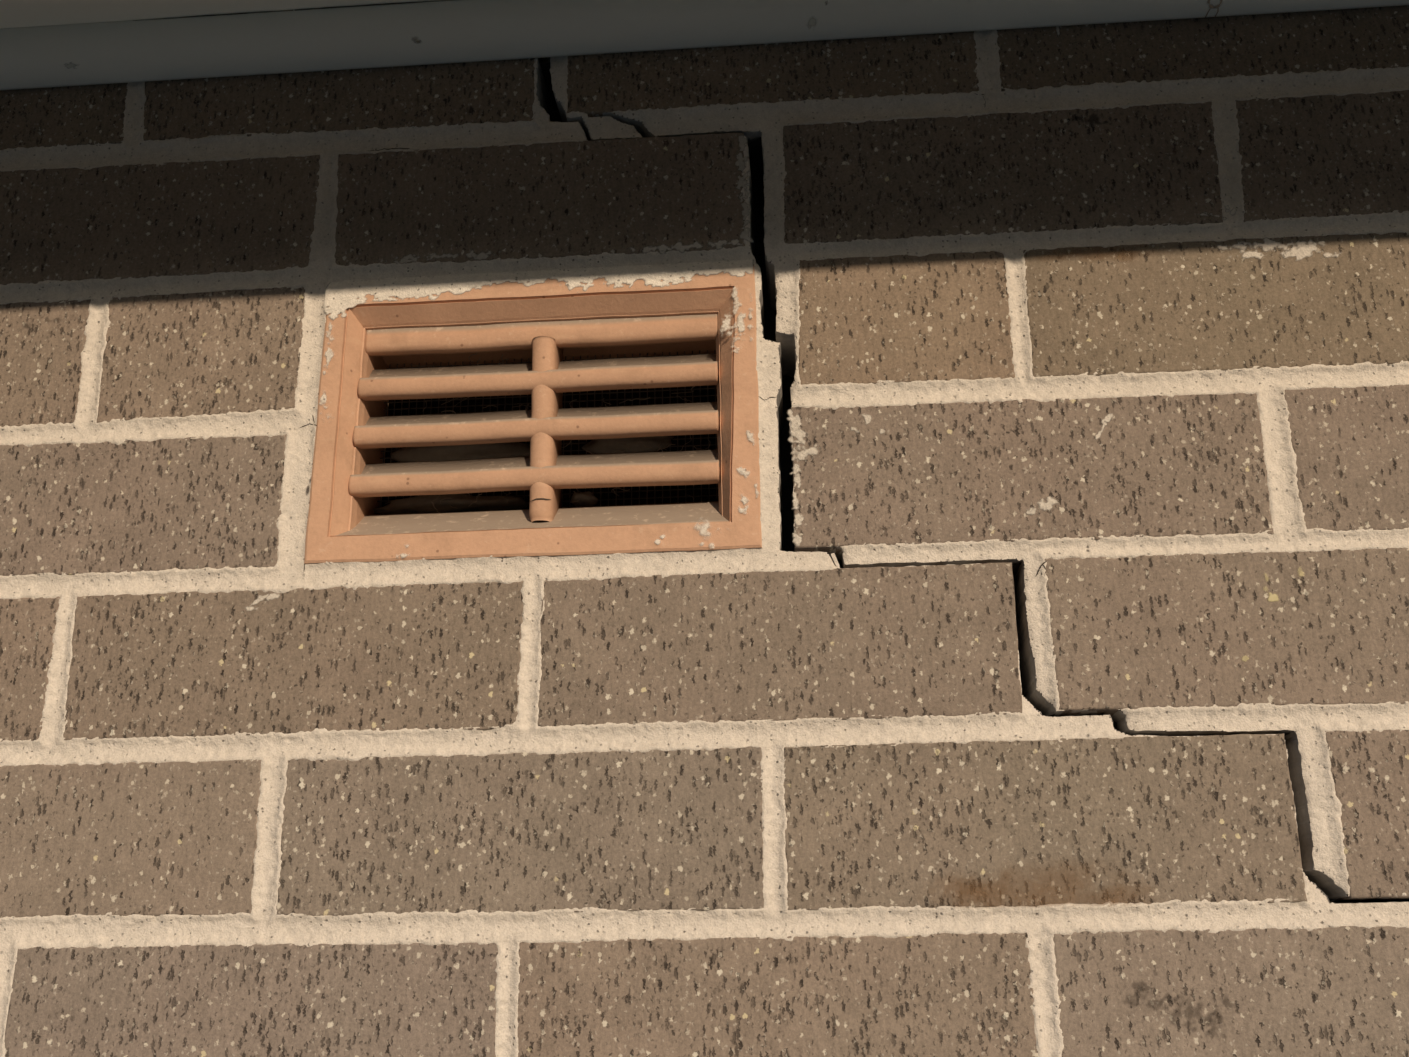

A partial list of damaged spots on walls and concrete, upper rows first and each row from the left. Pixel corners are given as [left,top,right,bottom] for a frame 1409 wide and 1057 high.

crack [536,60,1409,904]